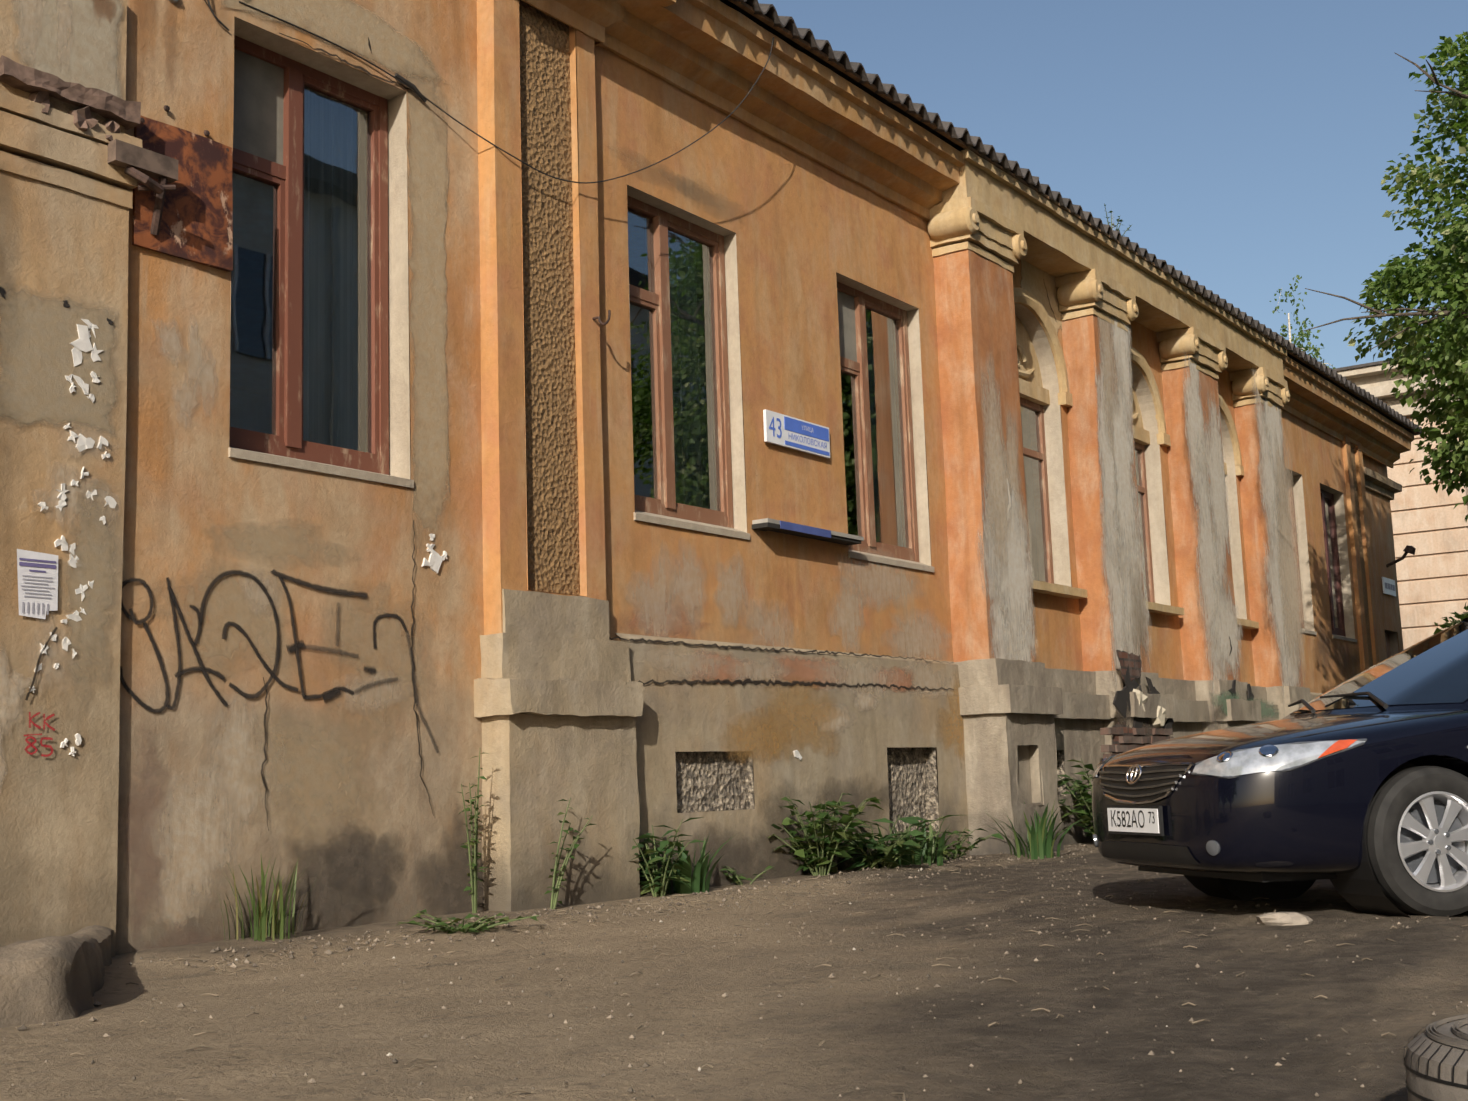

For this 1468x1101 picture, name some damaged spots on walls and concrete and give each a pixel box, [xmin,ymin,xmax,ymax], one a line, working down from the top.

peeling [65,319,103,403]
peeling [0,423,117,782]
crack [609,637,954,691]
peeling [980,371,1036,662]
peeling [1095,309,1174,761]
peeling [1183,358,1254,703]
peeling [1256,389,1304,691]